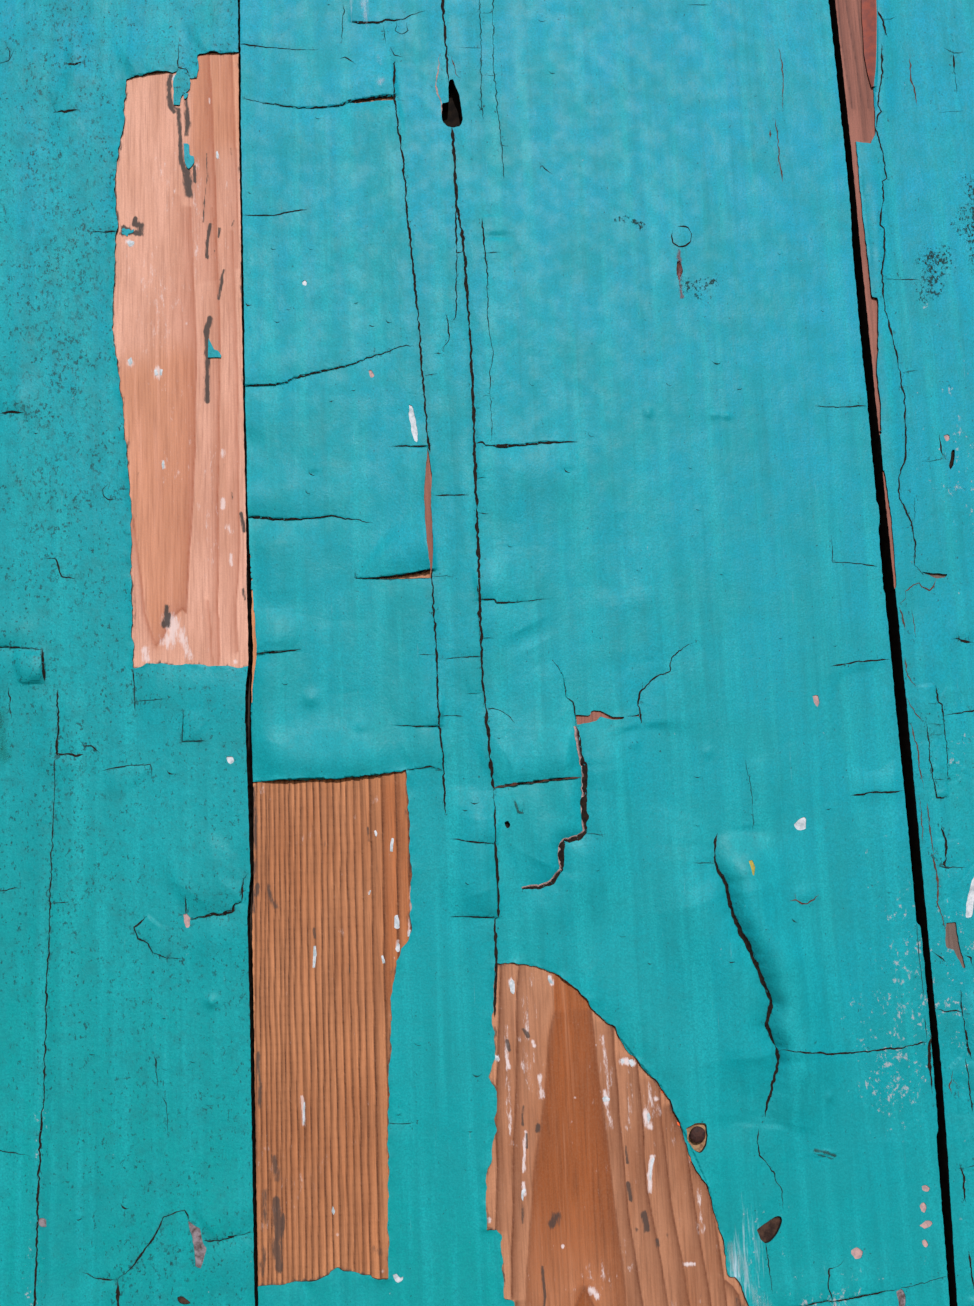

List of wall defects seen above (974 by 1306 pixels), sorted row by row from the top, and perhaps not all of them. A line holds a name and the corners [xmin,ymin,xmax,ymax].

crack [671,225,692,247]
peeling [828,0,896,594]
crack [133,672,204,742]
peeling [112,53,442,1286]
crack [245,0,599,1017]
crack [637,644,689,723]
crack [701,12,974,1209]
crack [0,646,152,1306]
crack [83,1210,250,1306]
crack [185,877,246,919]
peeling [486,962,748,1306]
crack [806,1254,974,1306]